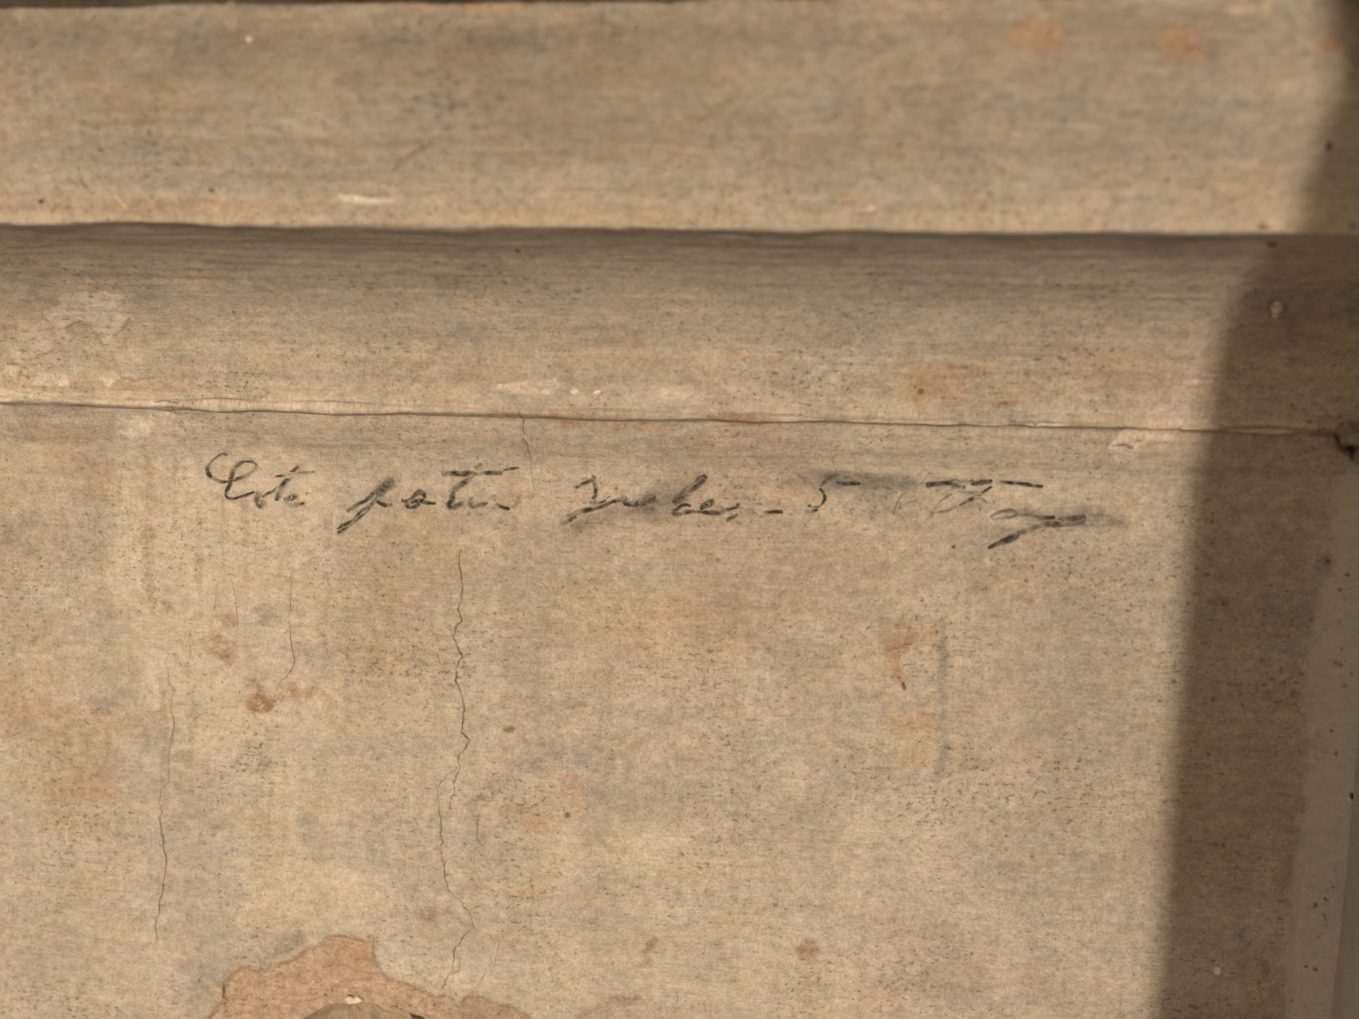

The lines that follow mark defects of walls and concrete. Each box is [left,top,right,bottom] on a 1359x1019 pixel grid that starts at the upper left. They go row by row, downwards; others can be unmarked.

spalling [204,933,532,1019]
crack [434,548,500,990]